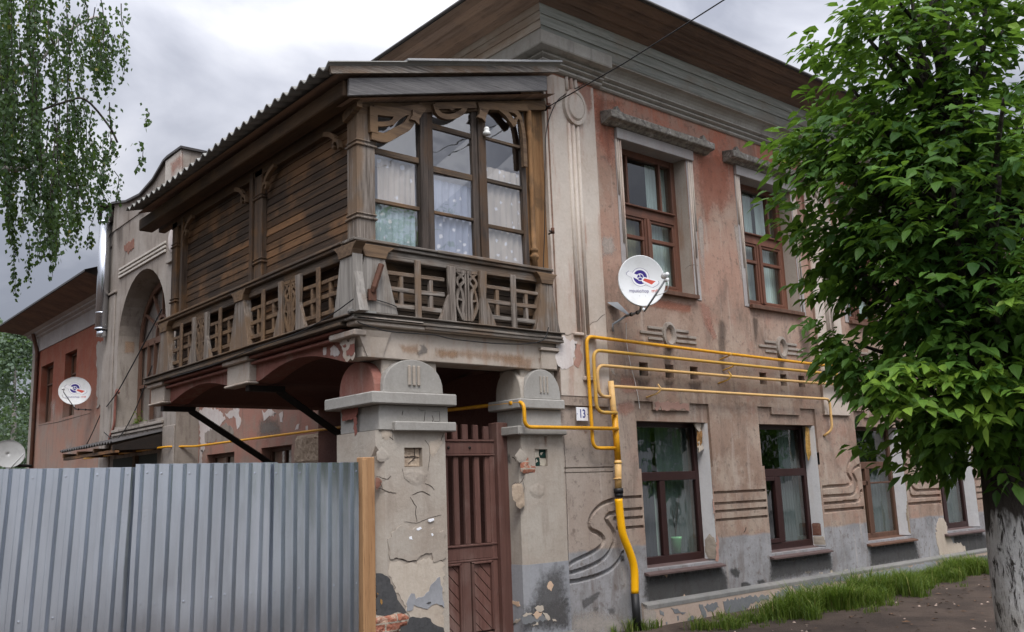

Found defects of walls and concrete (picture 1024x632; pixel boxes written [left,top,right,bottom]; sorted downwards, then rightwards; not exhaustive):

peeling [323,338,355,362]
peeling [555,336,583,369]
peeling [199,407,241,463]
crack [376,469,439,523]
spalling [512,458,536,509]
flaking render [860,517,966,578]
flaking render [375,525,446,632]